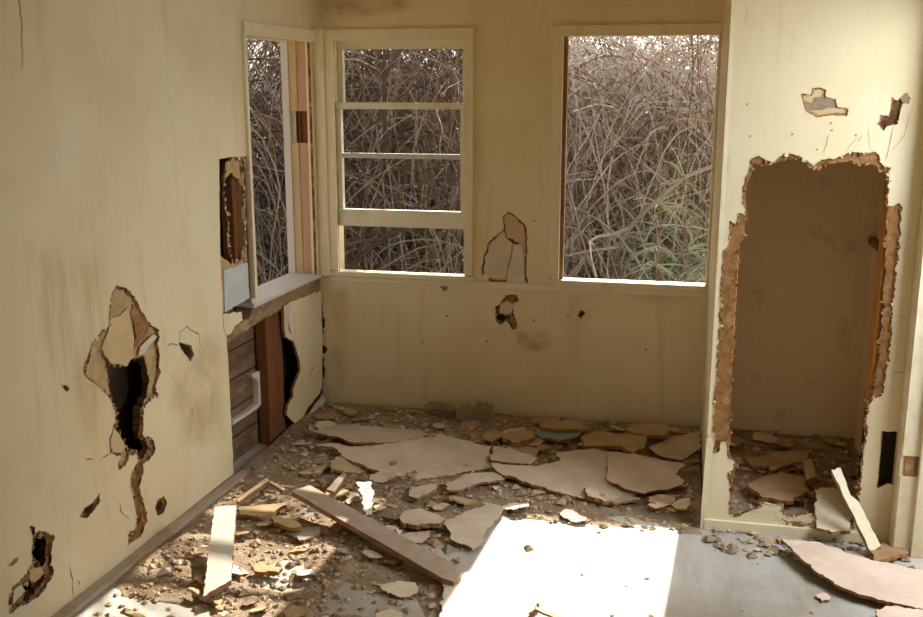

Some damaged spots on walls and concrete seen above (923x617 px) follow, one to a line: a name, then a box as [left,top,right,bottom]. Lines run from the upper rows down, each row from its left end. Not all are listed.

crack [16,0,24,62]
spalling [802,87,849,131]
hole [879,93,911,130]
spalling [221,156,247,267]
peeling [481,212,535,283]
spalling [495,295,519,330]
spalling [80,284,201,545]
peeling [729,501,815,526]
spalling [8,526,55,615]